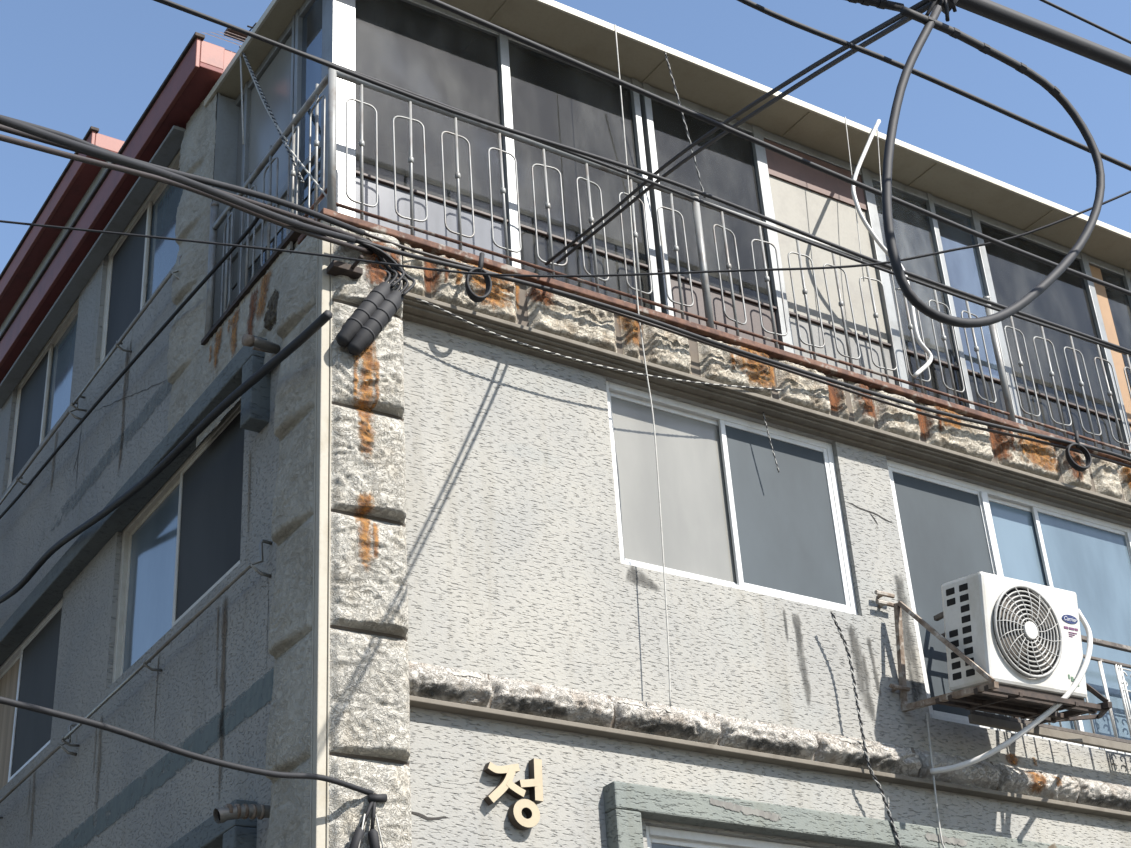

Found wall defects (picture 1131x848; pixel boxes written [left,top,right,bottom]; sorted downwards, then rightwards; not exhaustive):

rust [424,255,554,308]
rust [209,273,271,367]
rust [620,316,640,345]
rust [729,345,775,387]
rust [354,344,379,453]
rust [827,381,875,417]
rust [916,406,961,438]
rust [987,427,1084,479]
rust [356,494,379,567]
leakage [216,600,227,783]